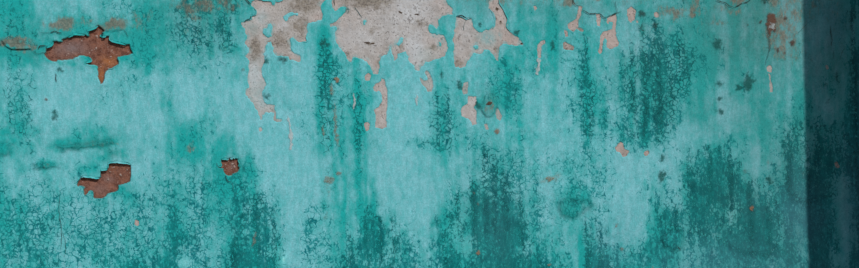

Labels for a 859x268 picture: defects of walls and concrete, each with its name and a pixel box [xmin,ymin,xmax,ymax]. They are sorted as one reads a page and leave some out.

leakage [318,35,333,150]
peeling [241,0,523,132]
peeling [563,6,584,50]
peeling [596,7,638,54]
rust [760,13,787,36]
leakage [783,0,859,202]
leakage [231,196,279,268]
leakage [344,213,400,268]
leakage [443,155,542,268]
leakage [582,227,613,268]
leakage [659,147,782,259]